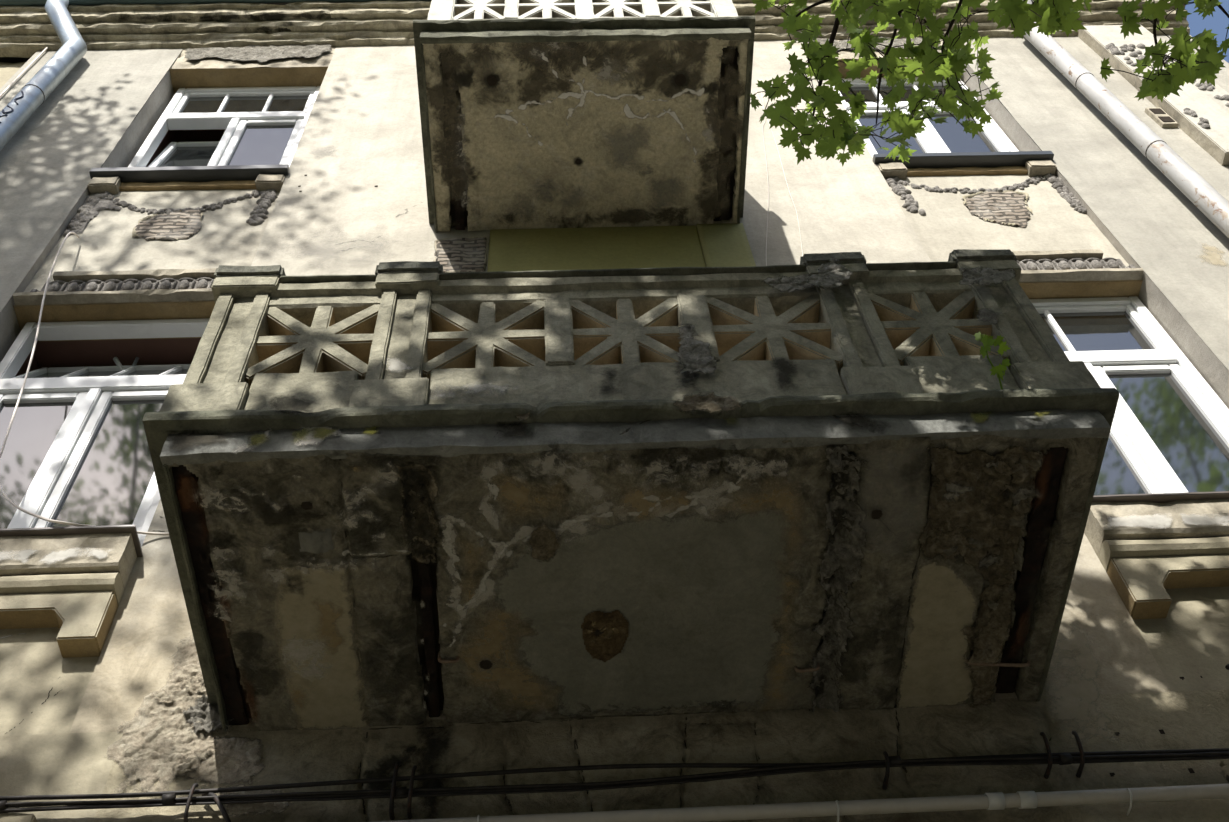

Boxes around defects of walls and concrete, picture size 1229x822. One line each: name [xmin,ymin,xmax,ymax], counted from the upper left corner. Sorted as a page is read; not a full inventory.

leakage [426,28,745,228]
leakage [200,453,439,591]
leakage [494,446,606,500]
leakage [604,436,811,511]
leakage [207,533,344,695]
corrosion [581,610,629,662]
peeling [898,562,1014,708]
flaking render [107,637,290,816]